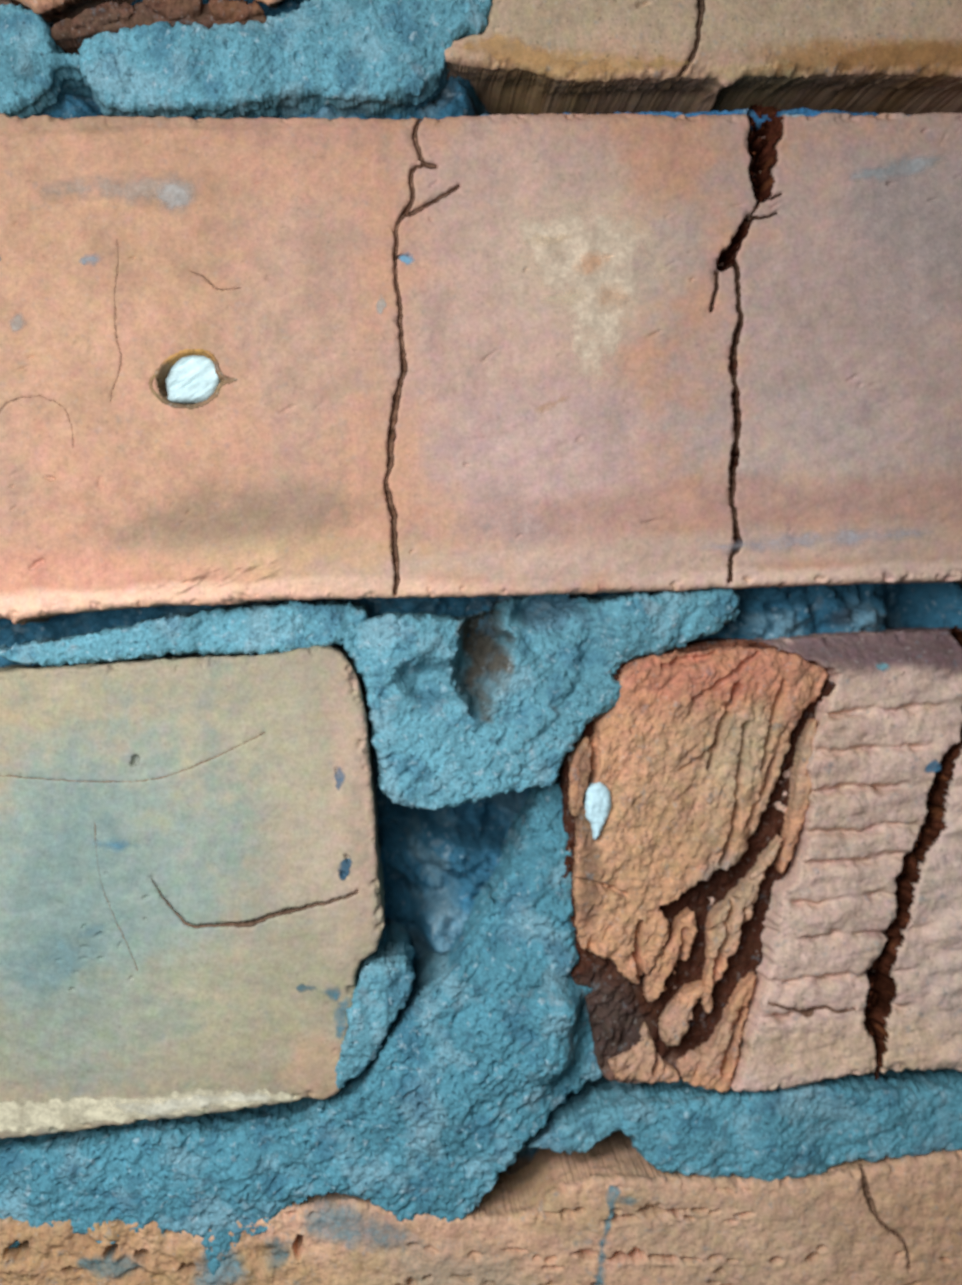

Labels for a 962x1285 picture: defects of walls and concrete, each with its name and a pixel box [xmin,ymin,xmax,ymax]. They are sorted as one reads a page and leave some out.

spalling [50,0,267,54]
crack [678,0,705,78]
crack [384,118,459,594]
crack [709,104,784,581]
crack [948,625,962,647]
crack [151,878,357,928]
spalling [557,638,836,1093]
crack [769,727,962,1081]